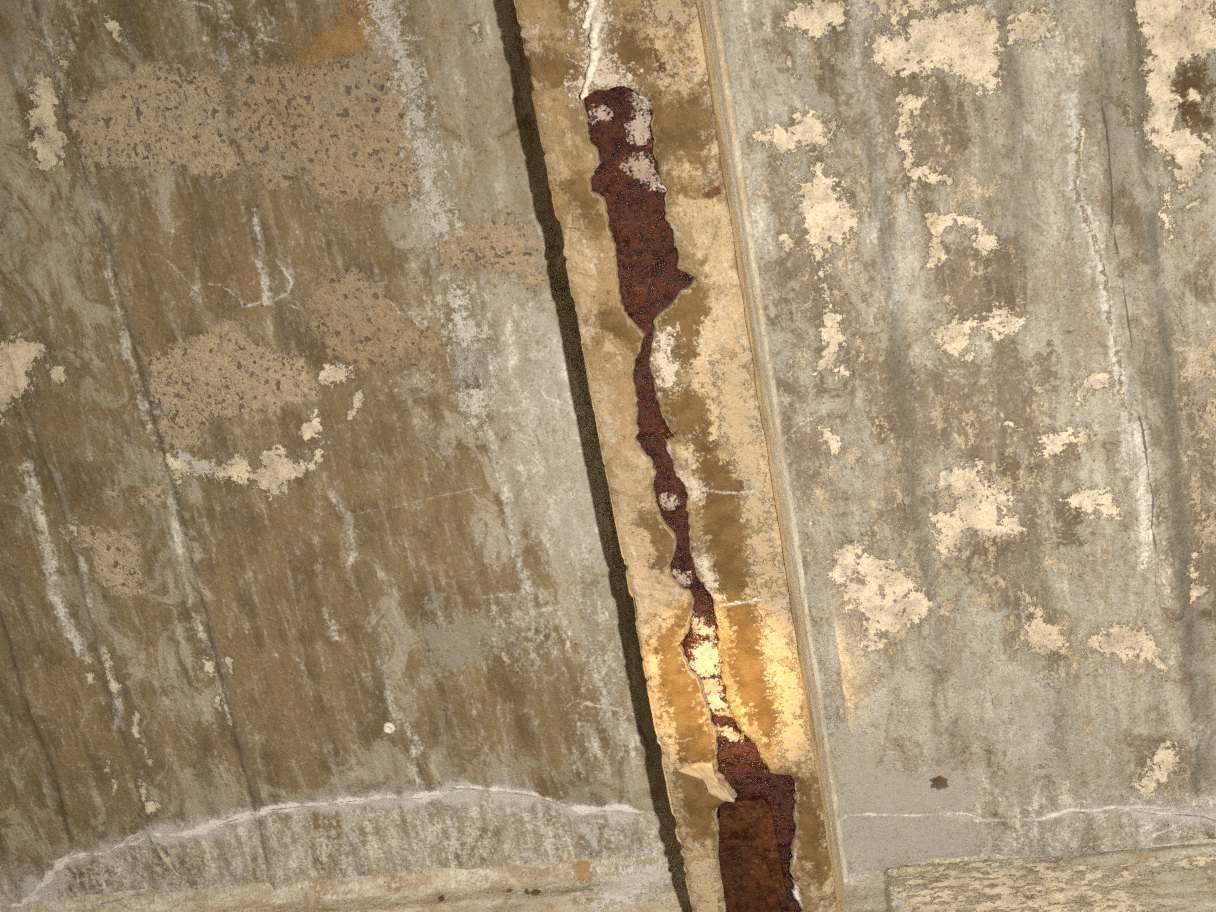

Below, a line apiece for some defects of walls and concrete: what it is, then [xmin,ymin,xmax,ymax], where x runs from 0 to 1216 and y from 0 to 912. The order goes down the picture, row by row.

rust [703,185,722,199]
peeling [746,103,868,383]
peeling [774,0,1060,277]
peeling [1122,0,1216,247]
damp [1171,56,1216,130]
peeling [0,330,71,427]
peeling [927,301,1031,362]
spalling [579,86,813,912]
peeling [925,457,1034,569]
peeling [823,531,936,656]
damp [952,642,1085,798]
rust [572,860,600,886]